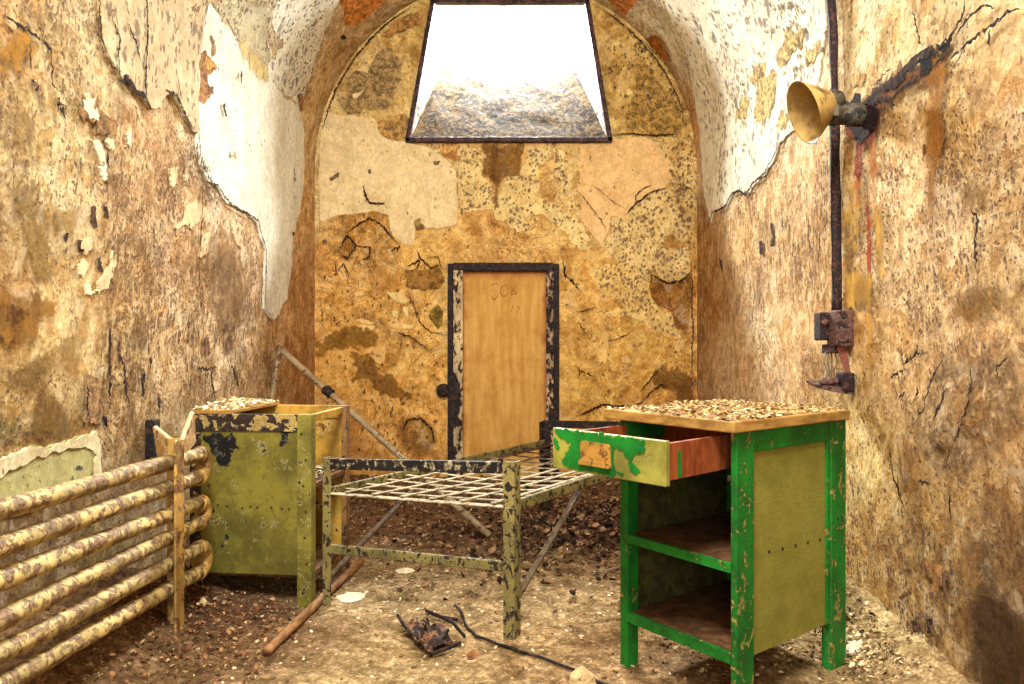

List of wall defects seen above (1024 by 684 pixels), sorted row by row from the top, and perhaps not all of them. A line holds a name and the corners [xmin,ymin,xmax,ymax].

crack [862,1,1020,118]
peeling [0,0,386,498]
water stain [481,143,524,207]
peeling [319,0,828,445]
corrosion [844,134,887,377]
crack [889,350,920,405]
crack [888,443,951,518]
water stain [966,541,1024,684]